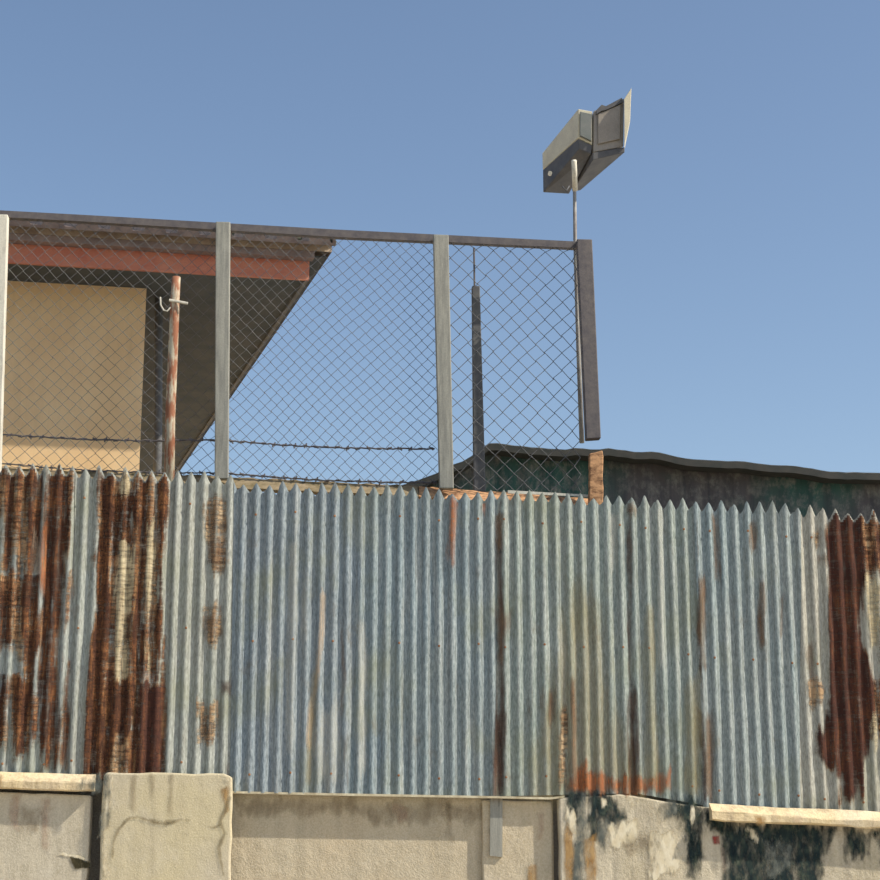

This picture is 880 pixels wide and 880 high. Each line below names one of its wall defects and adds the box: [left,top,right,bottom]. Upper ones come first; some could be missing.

rust [0,465,74,770]
rust [83,468,169,780]
rust [203,496,226,577]
rust [497,513,506,661]
rust [809,511,880,808]
rust [196,702,218,745]
rust [493,678,506,796]
rust [549,681,671,794]
crack [121,817,178,827]
crack [218,798,230,865]
damp [566,790,627,880]
damp [663,795,879,880]